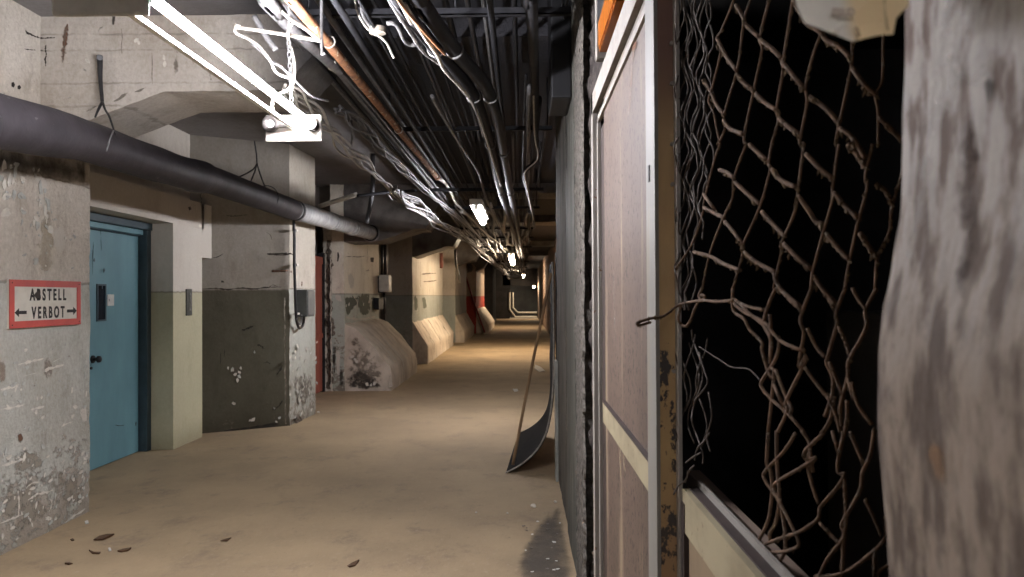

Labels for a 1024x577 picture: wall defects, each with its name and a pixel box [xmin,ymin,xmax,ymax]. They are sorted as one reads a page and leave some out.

spalling [272,240,376,424]
leakage [349,338,381,389]
peeling [0,444,88,540]